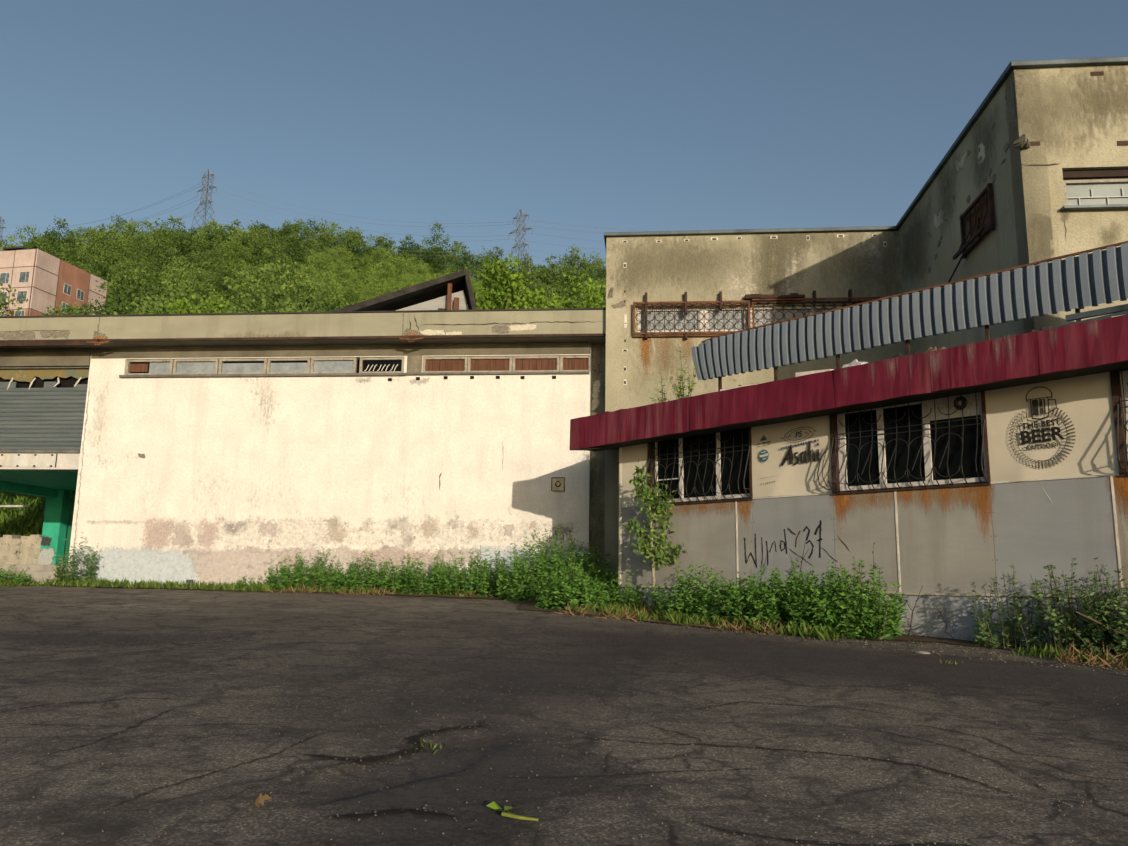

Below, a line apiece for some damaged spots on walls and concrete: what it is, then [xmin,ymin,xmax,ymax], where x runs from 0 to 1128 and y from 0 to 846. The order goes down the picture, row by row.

damp [758,233,813,295]
corrosion [835,485,990,521]
corrosion [1115,476,1128,499]
peeling [38,536,54,565]
peeling [72,517,588,585]